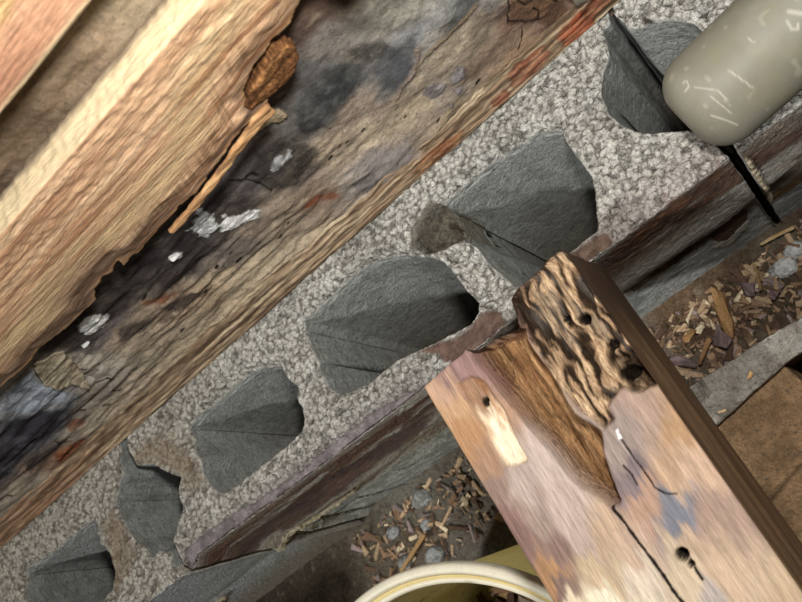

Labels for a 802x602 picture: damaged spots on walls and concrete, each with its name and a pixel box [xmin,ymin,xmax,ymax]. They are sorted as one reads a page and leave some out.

leakage [445,0,477,37]
leakage [296,41,416,132]
leakage [423,67,466,109]
rust [491,46,552,106]
leakage [256,141,316,189]
leakage [353,175,379,194]
leakage [61,190,262,348]
leakage [419,311,506,362]
leakage [0,396,80,479]
leakage [226,408,428,560]
crack [621,439,677,494]
crack [612,505,684,602]